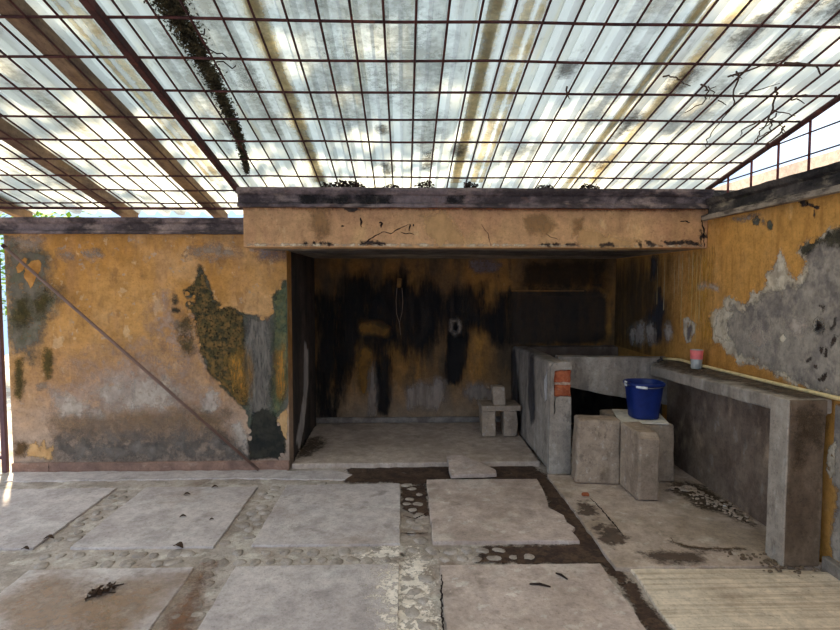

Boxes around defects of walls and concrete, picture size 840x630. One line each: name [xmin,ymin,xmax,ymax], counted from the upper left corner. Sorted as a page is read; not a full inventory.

water stain [4,235,63,399]
water stain [53,373,250,462]
peeling [172,245,289,459]
crack [360,225,414,246]
water stain [296,272,535,451]
water stain [630,249,715,345]
peeling [708,227,840,562]